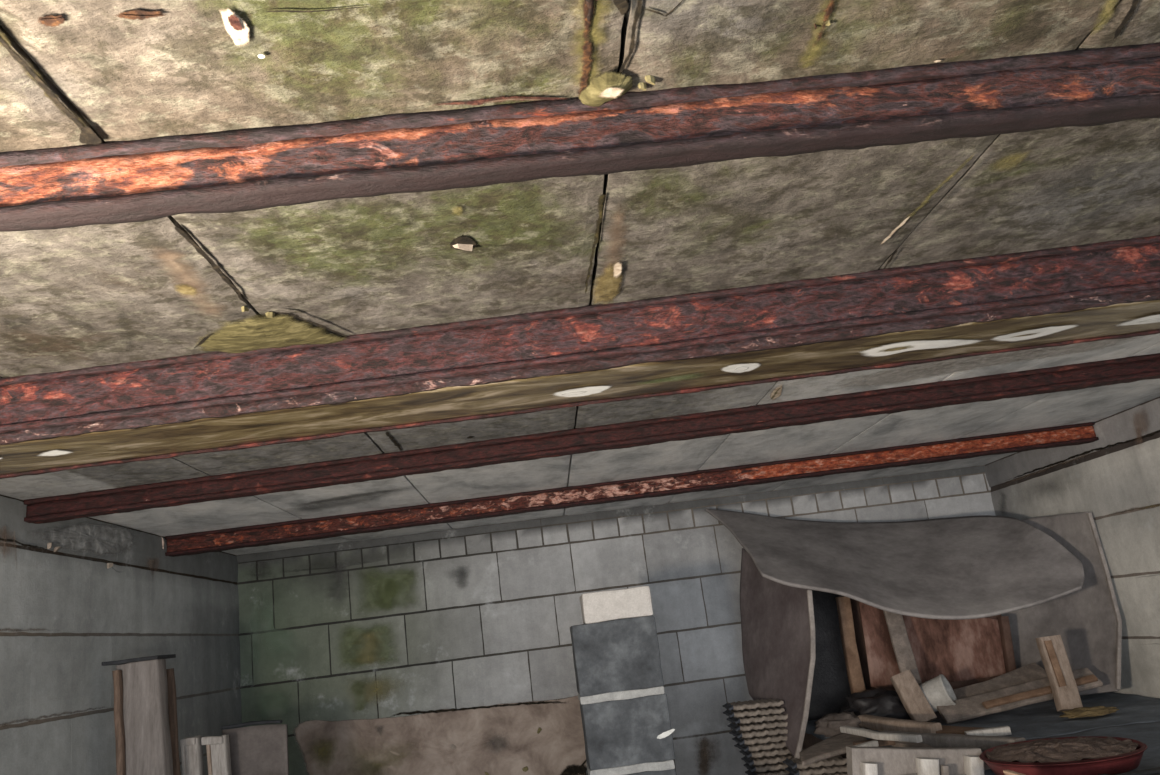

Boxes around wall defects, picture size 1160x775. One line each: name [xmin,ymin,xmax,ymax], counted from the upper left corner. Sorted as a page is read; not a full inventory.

crack [613,0,683,74]
crack [0,32,101,145]
rust [435,96,565,105]